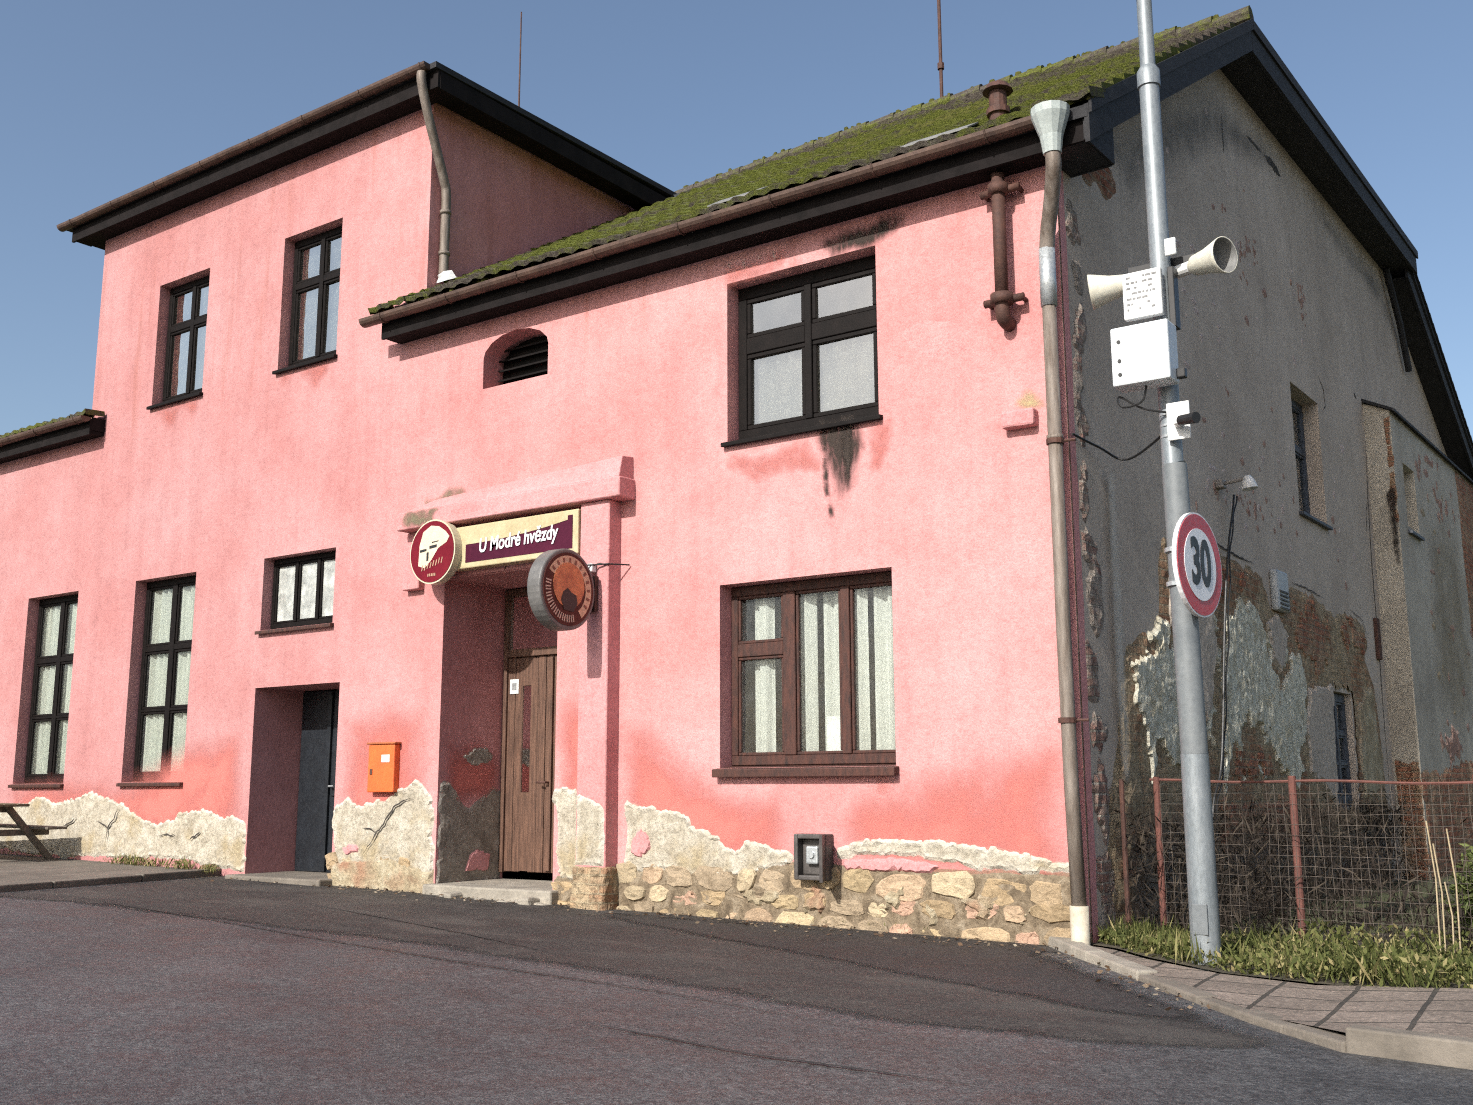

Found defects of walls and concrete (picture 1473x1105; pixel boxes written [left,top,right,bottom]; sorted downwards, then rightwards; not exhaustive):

leakage [760,417,859,515]
flaking render [1065,198,1190,949]
flaking render [1415,454,1473,656]
flaking render [463,747,493,766]
flaking render [1198,551,1473,921]
flaking render [0,790,247,872]
flaking render [332,779,500,883]
flaking render [552,786,605,880]
flaking render [624,800,794,875]
flaking render [837,838,1069,875]